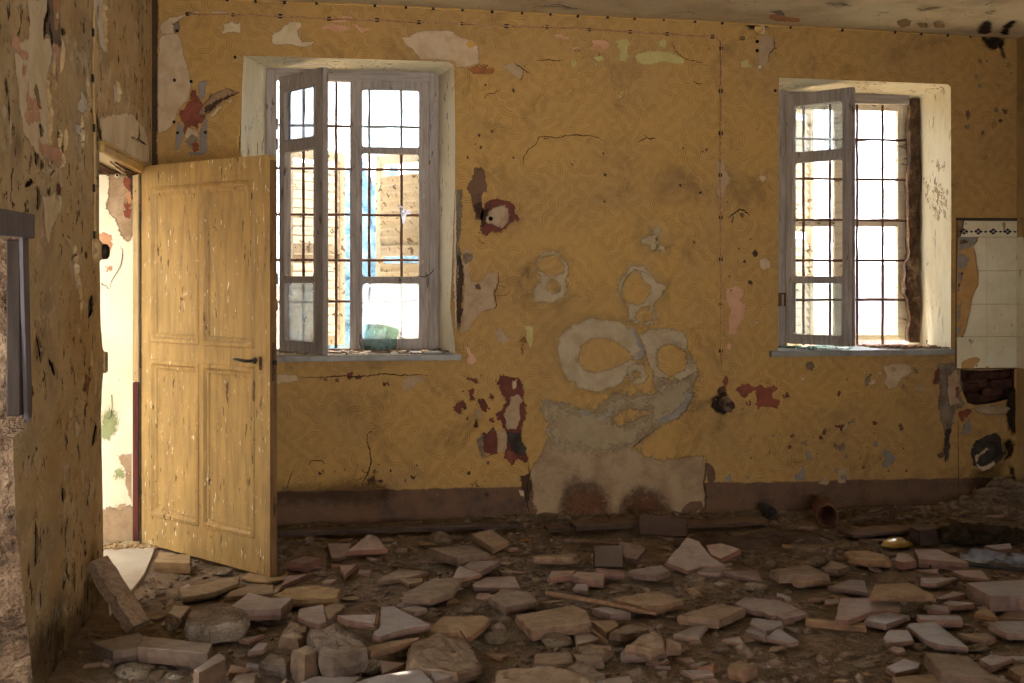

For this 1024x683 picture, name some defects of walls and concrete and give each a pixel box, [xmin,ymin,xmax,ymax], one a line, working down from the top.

peeling [93,0,109,53]
peeling [402,30,479,68]
peeling [11,0,63,168]
peeling [75,10,242,163]
crack [523,134,605,163]
peeling [42,191,62,244]
spalling [105,174,140,242]
peeling [456,156,520,333]
crack [303,371,429,386]
crack [361,431,372,488]
peeling [519,371,732,516]
spalling [861,362,1012,462]